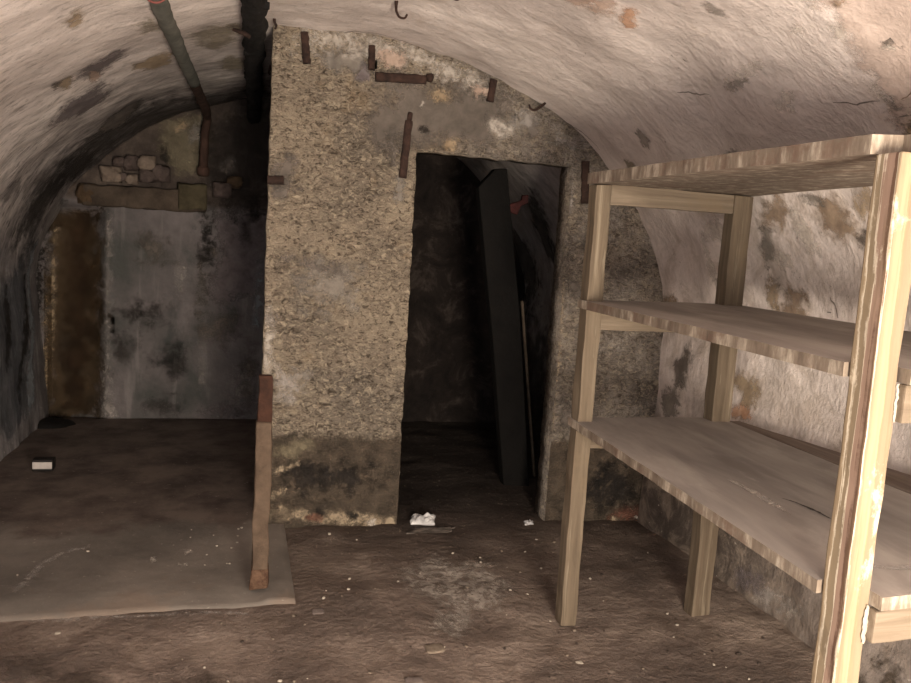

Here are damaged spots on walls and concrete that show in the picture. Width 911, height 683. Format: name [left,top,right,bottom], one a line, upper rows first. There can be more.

flaking render [568,0,636,29]
crack [833,99,876,107]
flaking render [813,0,911,135]
damp [0,241,38,439]
corrosion [36,207,111,418]
damp [268,432,401,528]
damp [871,660,901,683]